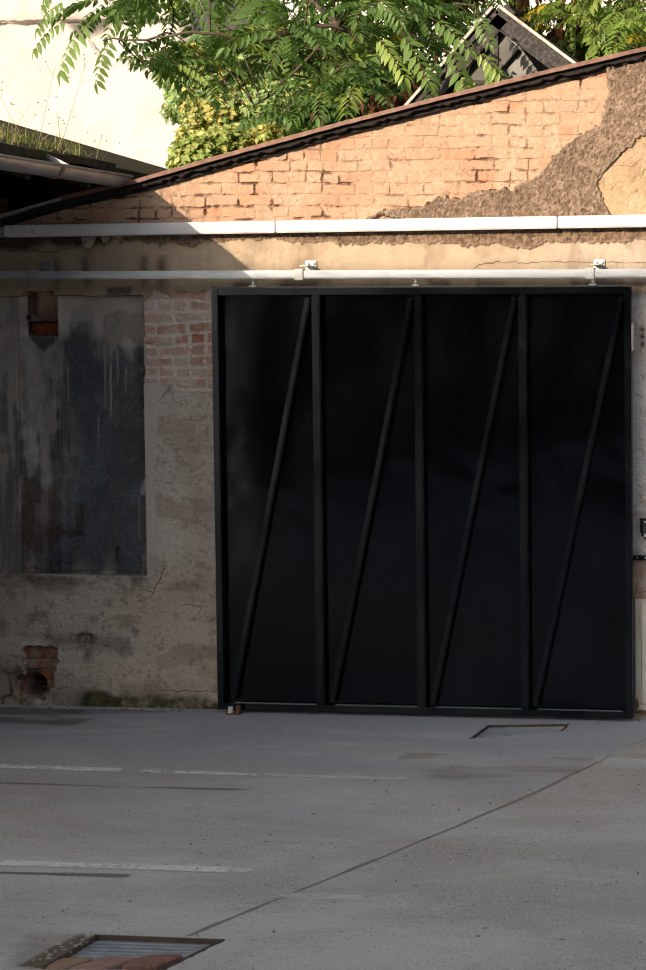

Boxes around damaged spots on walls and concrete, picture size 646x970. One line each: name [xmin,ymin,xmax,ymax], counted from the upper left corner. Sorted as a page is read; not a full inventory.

flaking render [13,71,609,225]
flaking render [143,288,213,398]
damp [20,312,147,575]
spalling [15,644,60,700]